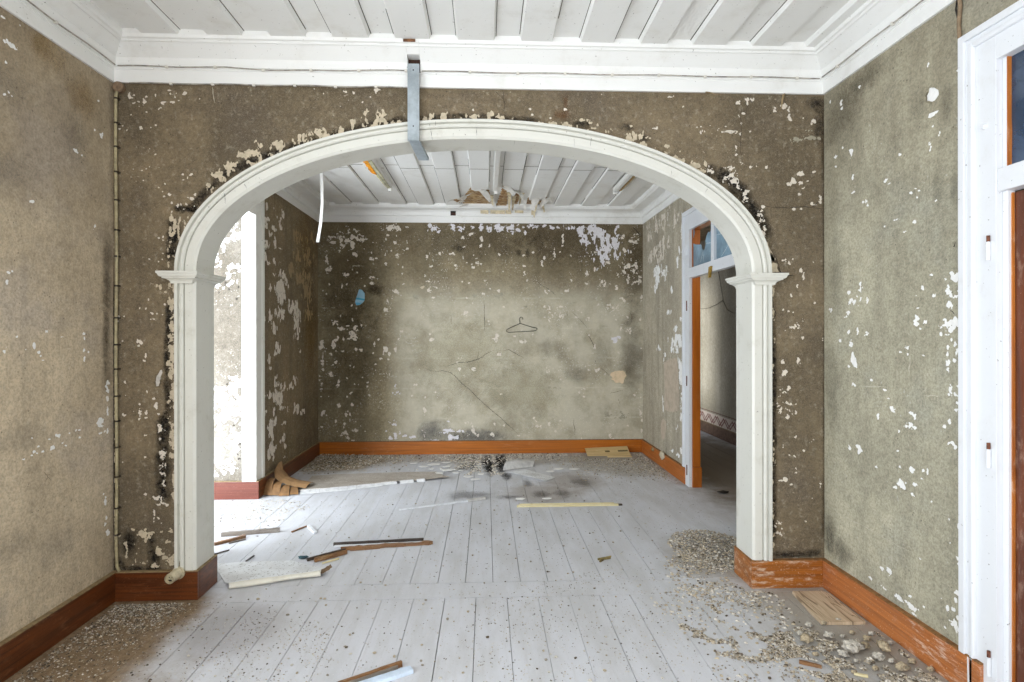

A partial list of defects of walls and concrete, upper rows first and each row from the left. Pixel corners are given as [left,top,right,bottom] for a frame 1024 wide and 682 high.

peeling [148,88,402,268]
peeling [626,97,768,203]
flaking render [925,85,941,151]
leakage [105,273,159,570]
leakage [155,305,174,501]
peeling [215,224,242,300]
peeling [265,202,682,461]
crack [435,307,522,428]
flaking render [757,205,814,340]
peeling [772,357,801,419]
peeling [839,282,869,368]
peeling [913,271,958,428]